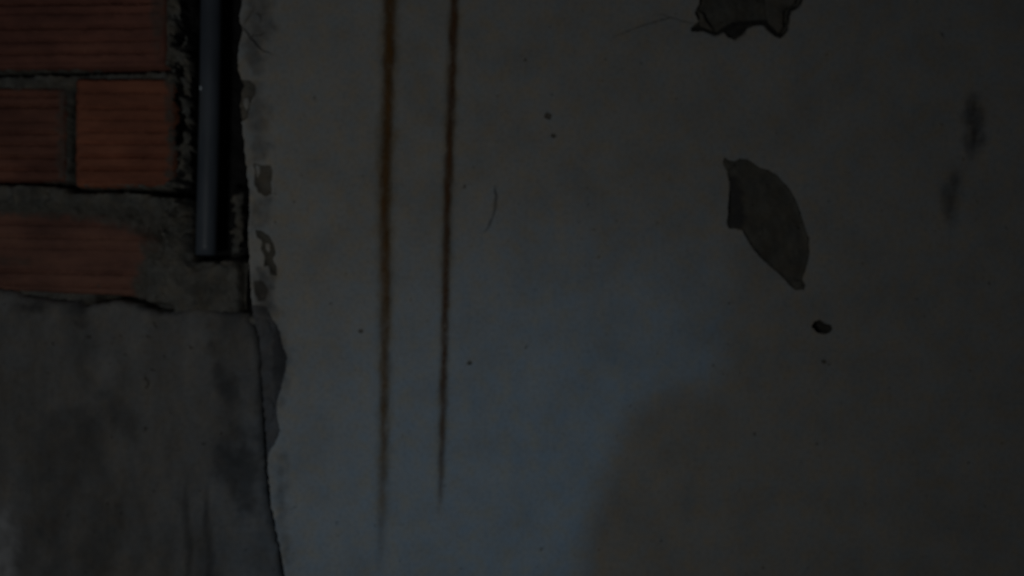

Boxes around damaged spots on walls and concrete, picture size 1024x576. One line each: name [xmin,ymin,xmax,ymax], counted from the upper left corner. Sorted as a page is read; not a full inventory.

flaking render [0,0,287,460]
corrosion [382,0,394,310]
corrosion [441,0,457,434]
spalling [691,0,802,40]
flaking render [723,157,810,290]